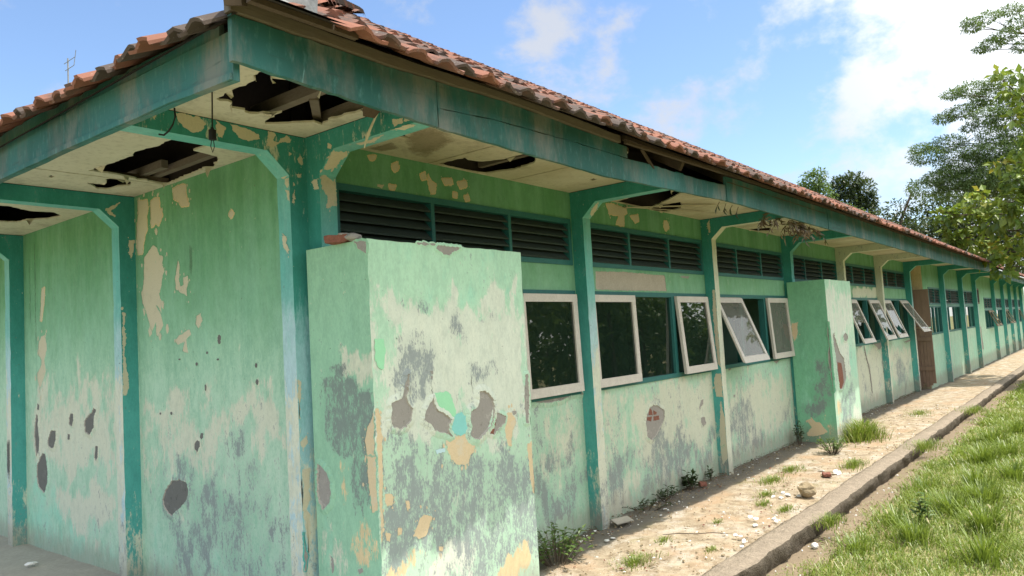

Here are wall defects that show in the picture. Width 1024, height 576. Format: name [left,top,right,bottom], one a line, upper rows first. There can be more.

peeling [176,113,383,212]
peeling [377,161,400,191]
peeling [419,171,470,202]
peeling [128,183,222,367]
flaking render [34,286,99,497]
flaking render [643,401,666,444]
flaking render [825,320,882,393]
flaking render [362,368,584,551]
flaking render [161,473,192,522]